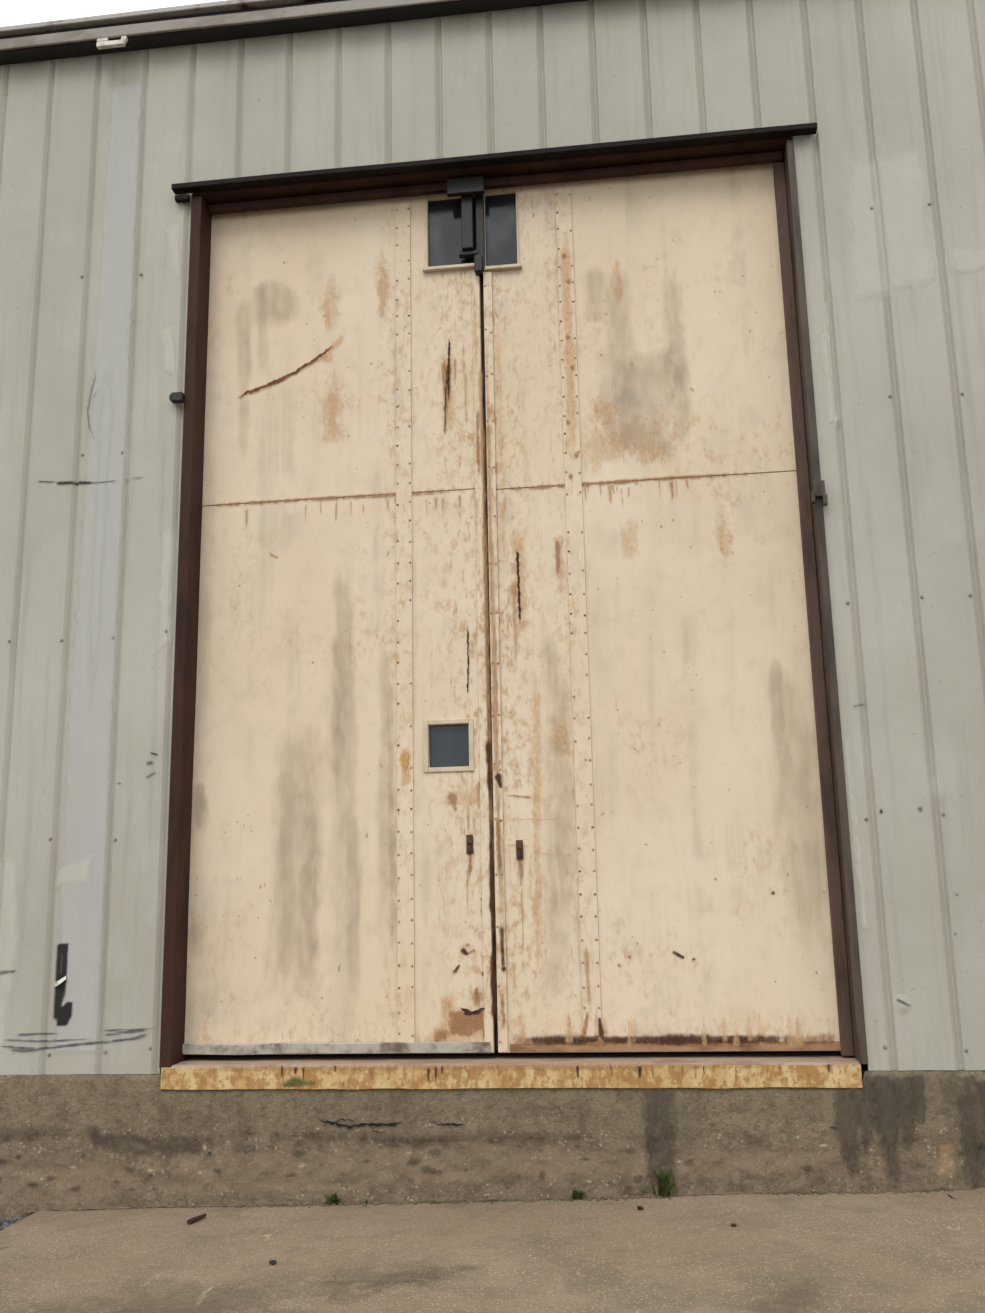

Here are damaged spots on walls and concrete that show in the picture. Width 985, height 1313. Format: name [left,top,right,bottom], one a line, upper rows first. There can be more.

rust [442,359,490,501]
rust [217,494,396,521]
rust [519,474,725,502]
rust [478,517,506,1024]
rust [255,1065,336,1079]
rust [420,1063,654,1081]
rust [516,1014,792,1046]
damp [646,1092,675,1182]
damp [836,1075,926,1179]
damp [945,1076,985,1188]